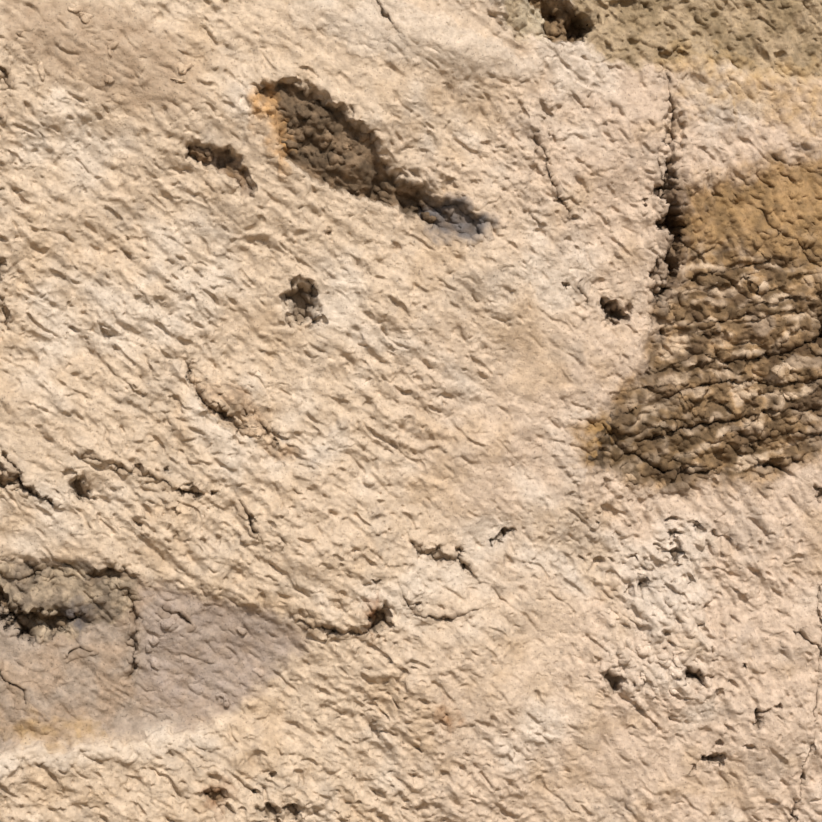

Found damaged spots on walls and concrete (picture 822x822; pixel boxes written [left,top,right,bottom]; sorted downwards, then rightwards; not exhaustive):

peeling [0,0,209,127]
spalling [528,0,596,46]
crack [0,253,14,327]
spalling [186,137,258,204]
spalling [254,76,436,224]
crack [643,69,686,330]
leakage [649,166,699,307]
leakage [754,298,822,387]
crack [0,443,61,511]
crack [77,447,176,494]
leakage [587,383,720,511]
peeling [0,558,313,732]